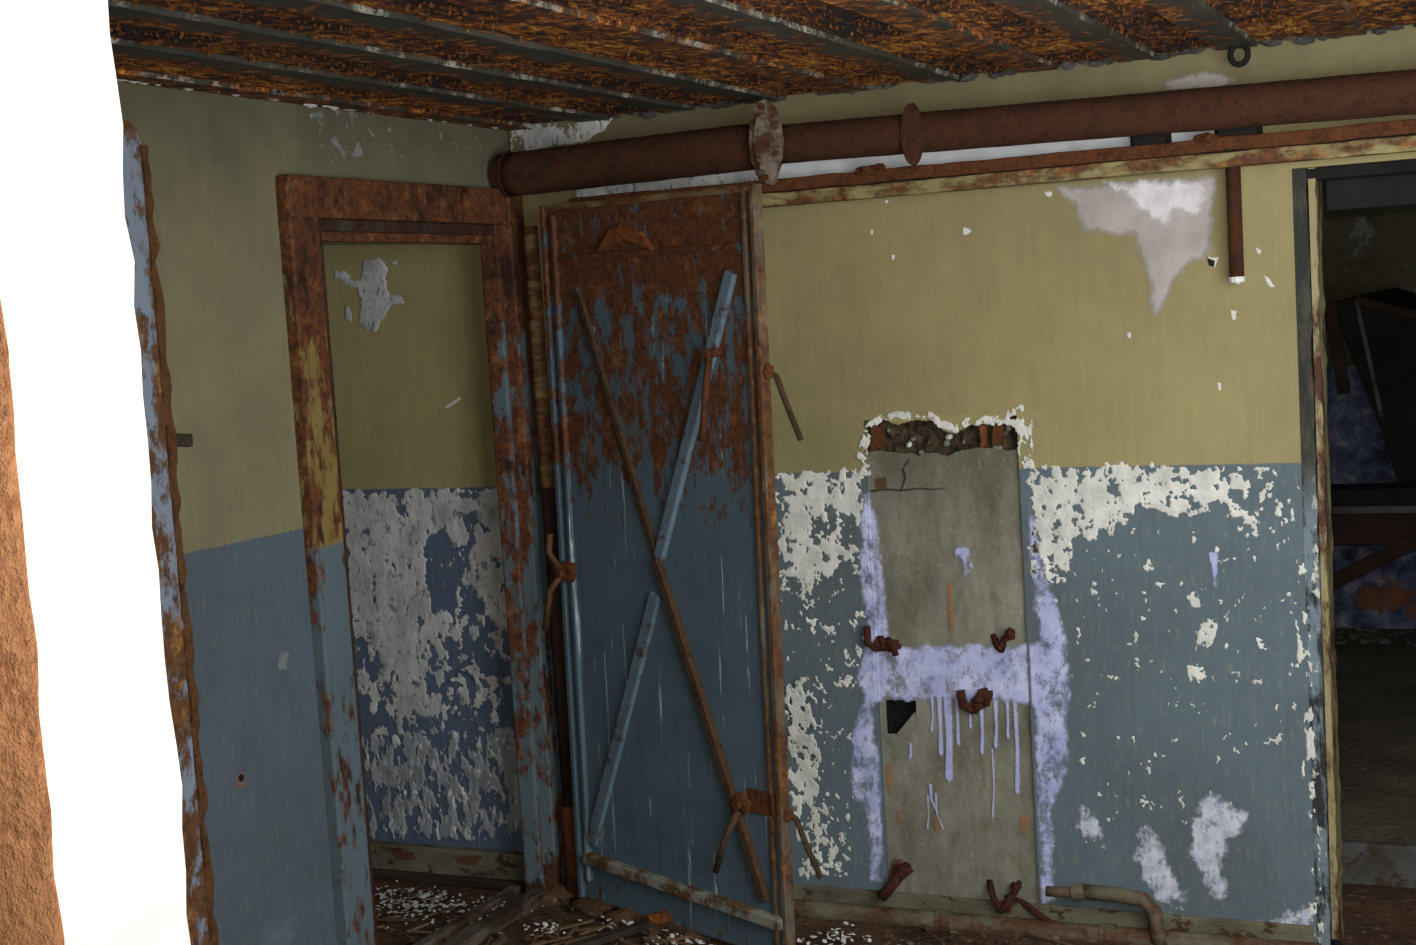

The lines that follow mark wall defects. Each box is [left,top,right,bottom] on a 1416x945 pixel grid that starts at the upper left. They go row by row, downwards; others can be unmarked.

corrosion [109,0,1004,125]
corrosion [896,0,1103,65]
corrosion [1064,0,1202,54]
corrosion [1207,0,1318,41]
peeling [334,257,404,332]
corrosion [597,223,656,252]
peeling [342,486,522,841]
spalling [775,404,1300,903]
peeling [1281,559,1312,687]
leakage [927,692,1020,829]
peeling [1216,702,1324,937]